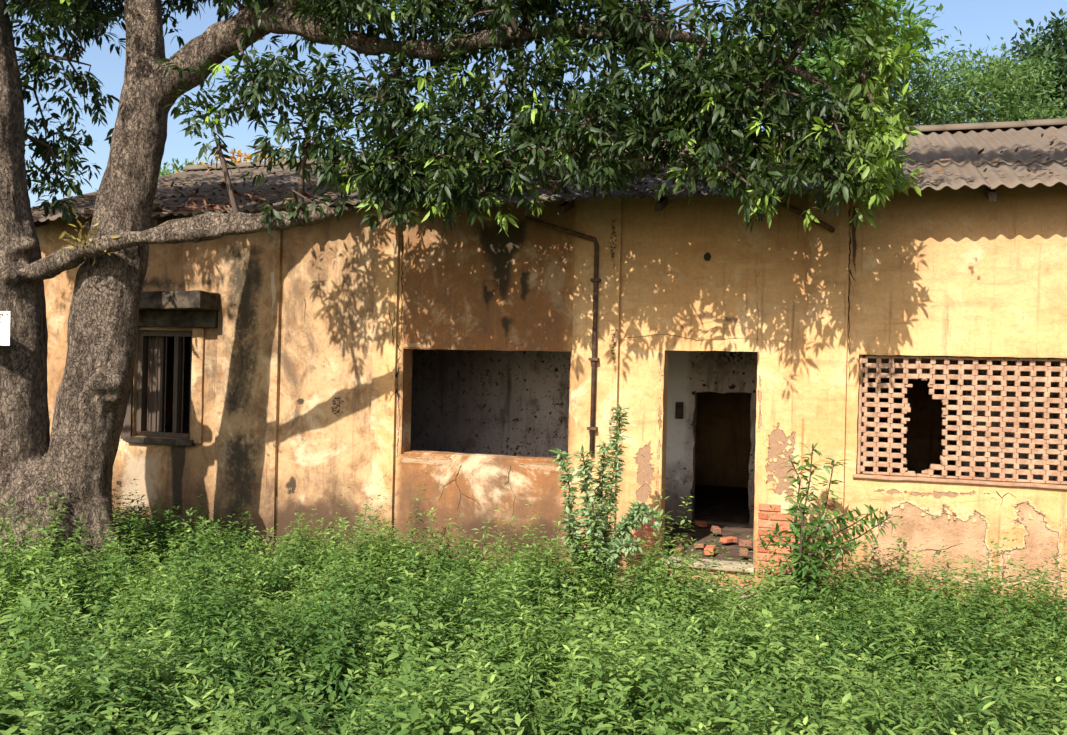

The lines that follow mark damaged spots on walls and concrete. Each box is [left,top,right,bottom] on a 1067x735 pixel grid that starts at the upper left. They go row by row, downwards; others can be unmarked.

leakage [465,210,539,346]
crack [627,239,787,347]
crack [848,208,856,376]
leakage [142,234,373,557]
peeling [629,352,664,547]
peeling [756,374,805,579]
flaking render [862,483,1067,590]